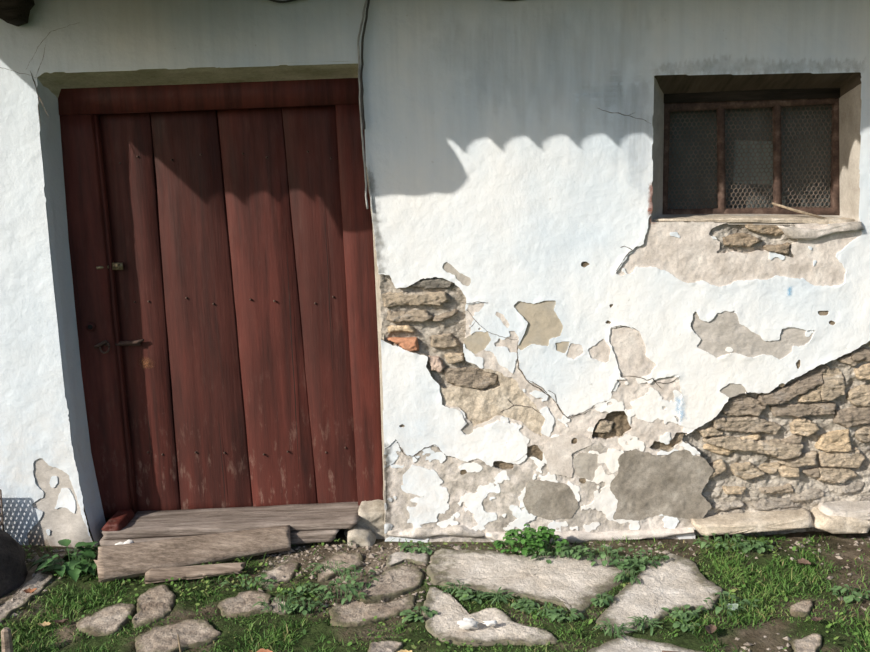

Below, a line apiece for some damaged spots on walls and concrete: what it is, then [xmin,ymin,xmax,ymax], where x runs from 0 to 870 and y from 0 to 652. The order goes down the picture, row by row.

crack [0,23,77,126]
peeling [616,216,862,287]
spalling [379,274,870,543]
peeling [27,458,93,548]